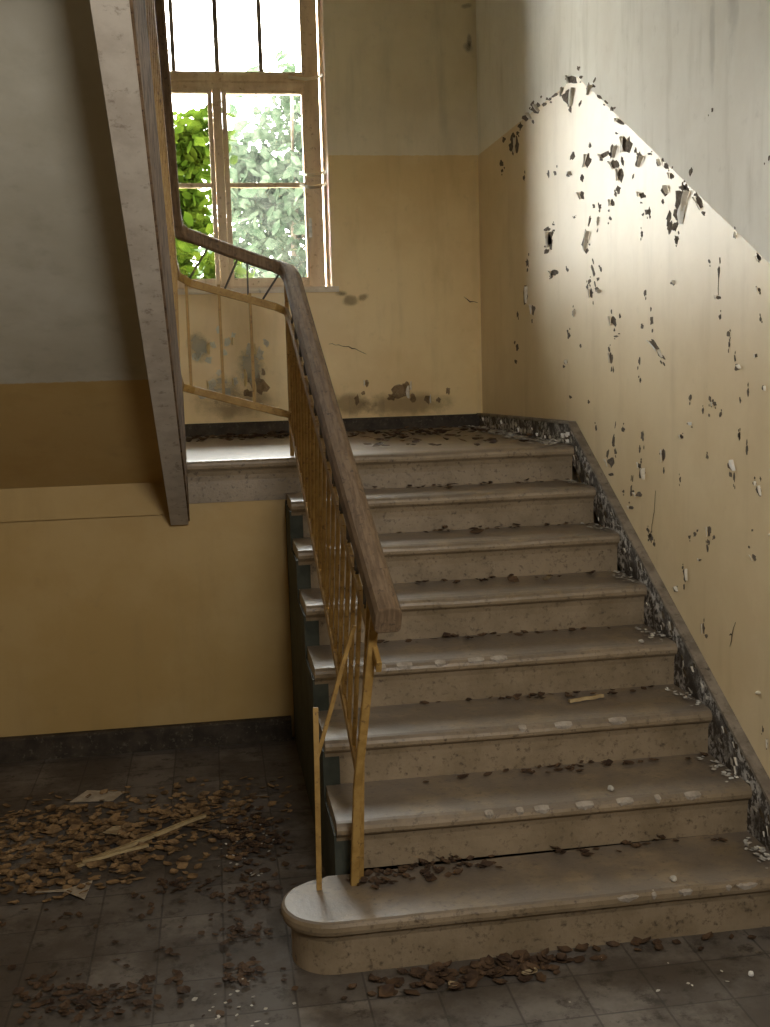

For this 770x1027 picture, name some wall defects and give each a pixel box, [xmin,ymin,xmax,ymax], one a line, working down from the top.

peeling [500,66,705,304]
peeling [192,326,270,399]
peeling [387,381,450,404]
peeling [607,309,621,372]
peeling [641,290,665,366]
peeling [603,422,625,476]
peeling [597,432,646,528]
peeling [688,526,715,561]
peeling [646,602,707,700]